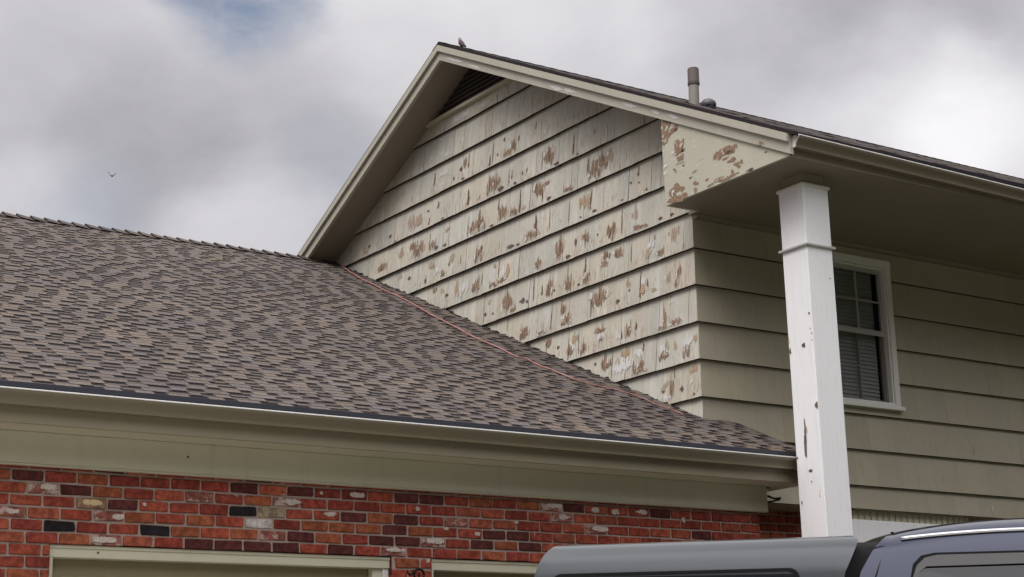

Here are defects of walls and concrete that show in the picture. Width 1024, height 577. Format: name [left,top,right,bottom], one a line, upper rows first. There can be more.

peeling [398,210,459,298]
peeling [472,262,517,316]
peeling [467,205,526,233]
peeling [486,142,559,200]
peeling [563,147,613,218]
peeling [519,221,681,357]
peeling [631,120,753,258]
peeling [594,302,697,375]
peeling [661,379,695,396]